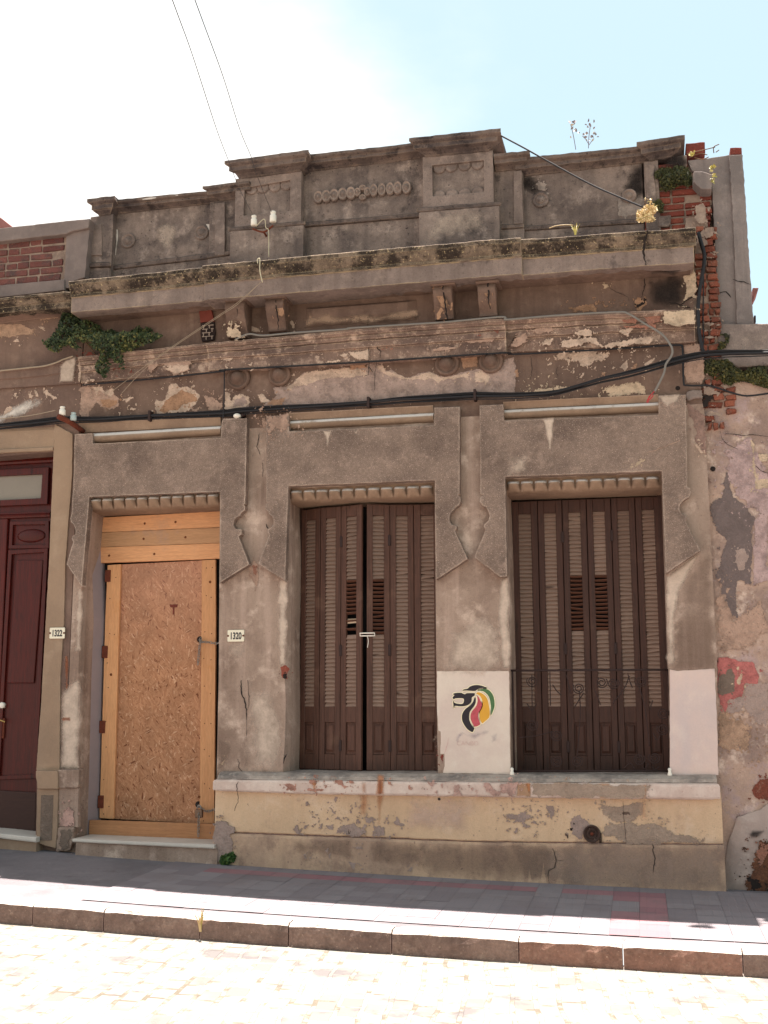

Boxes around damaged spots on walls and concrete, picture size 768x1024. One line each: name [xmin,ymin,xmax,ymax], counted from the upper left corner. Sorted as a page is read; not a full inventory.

spalling [692,171,712,197]
crack [610,230,648,299]
peeling [0,317,58,346]
peeling [4,387,59,416]
peeling [74,263,768,803]
crack [240,683,250,734]
peeling [280,774,409,840]
peeling [407,735,709,846]
spalling [734,836,768,891]